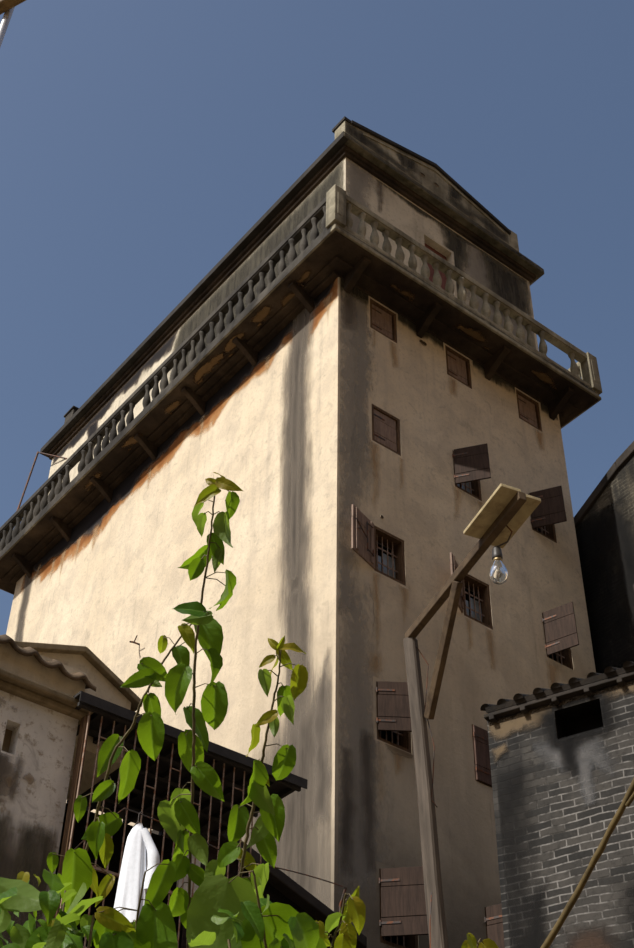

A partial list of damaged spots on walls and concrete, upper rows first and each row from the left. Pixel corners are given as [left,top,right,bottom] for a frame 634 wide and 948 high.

rust [309,277,338,336]
rust [21,317,296,591]
leakage [263,308,380,907]
leakage [0,817,56,892]
leakage [242,812,261,854]
leakage [0,910,43,948]